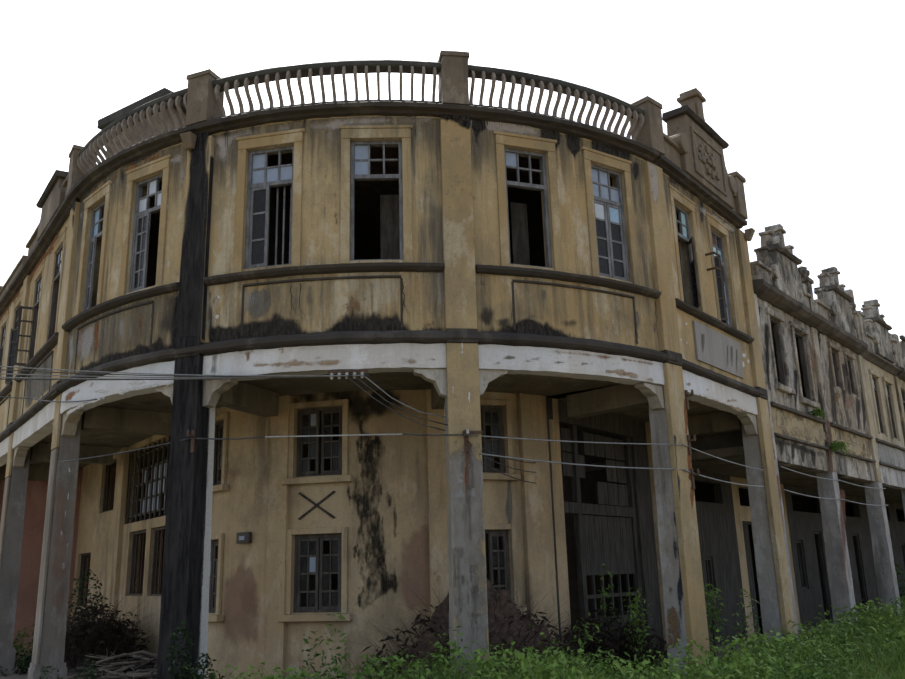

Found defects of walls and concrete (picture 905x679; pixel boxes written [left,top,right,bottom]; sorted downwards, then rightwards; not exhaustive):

water stain [508,129,643,205]
water stain [481,309,574,338]
water stain [65,114,496,679]